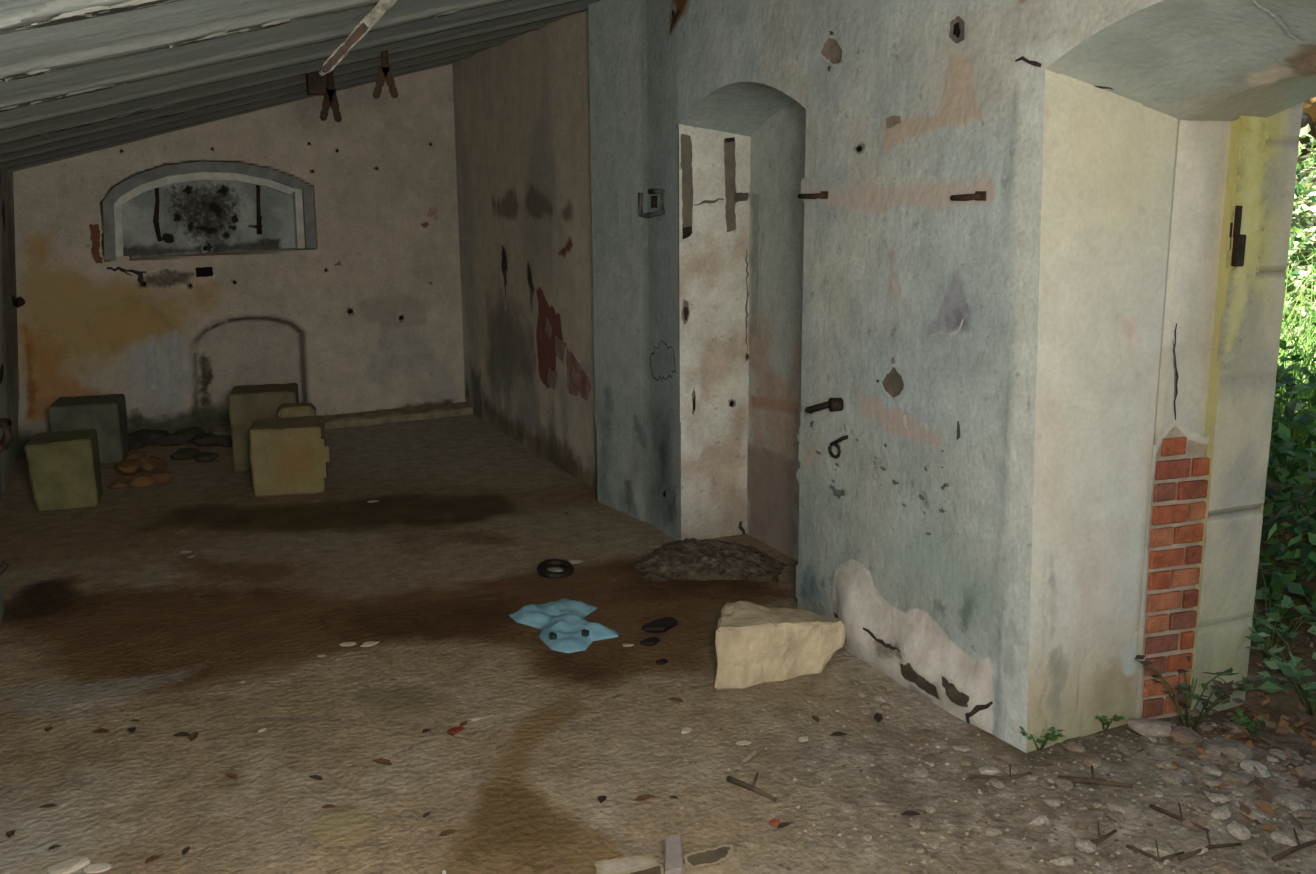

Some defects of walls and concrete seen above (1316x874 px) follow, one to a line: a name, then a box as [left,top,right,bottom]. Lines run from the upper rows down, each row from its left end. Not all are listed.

leakage [0,169,825,874]
peeling [534,283,594,407]
spalling [1116,419,1210,719]
crack [1172,323,1180,420]